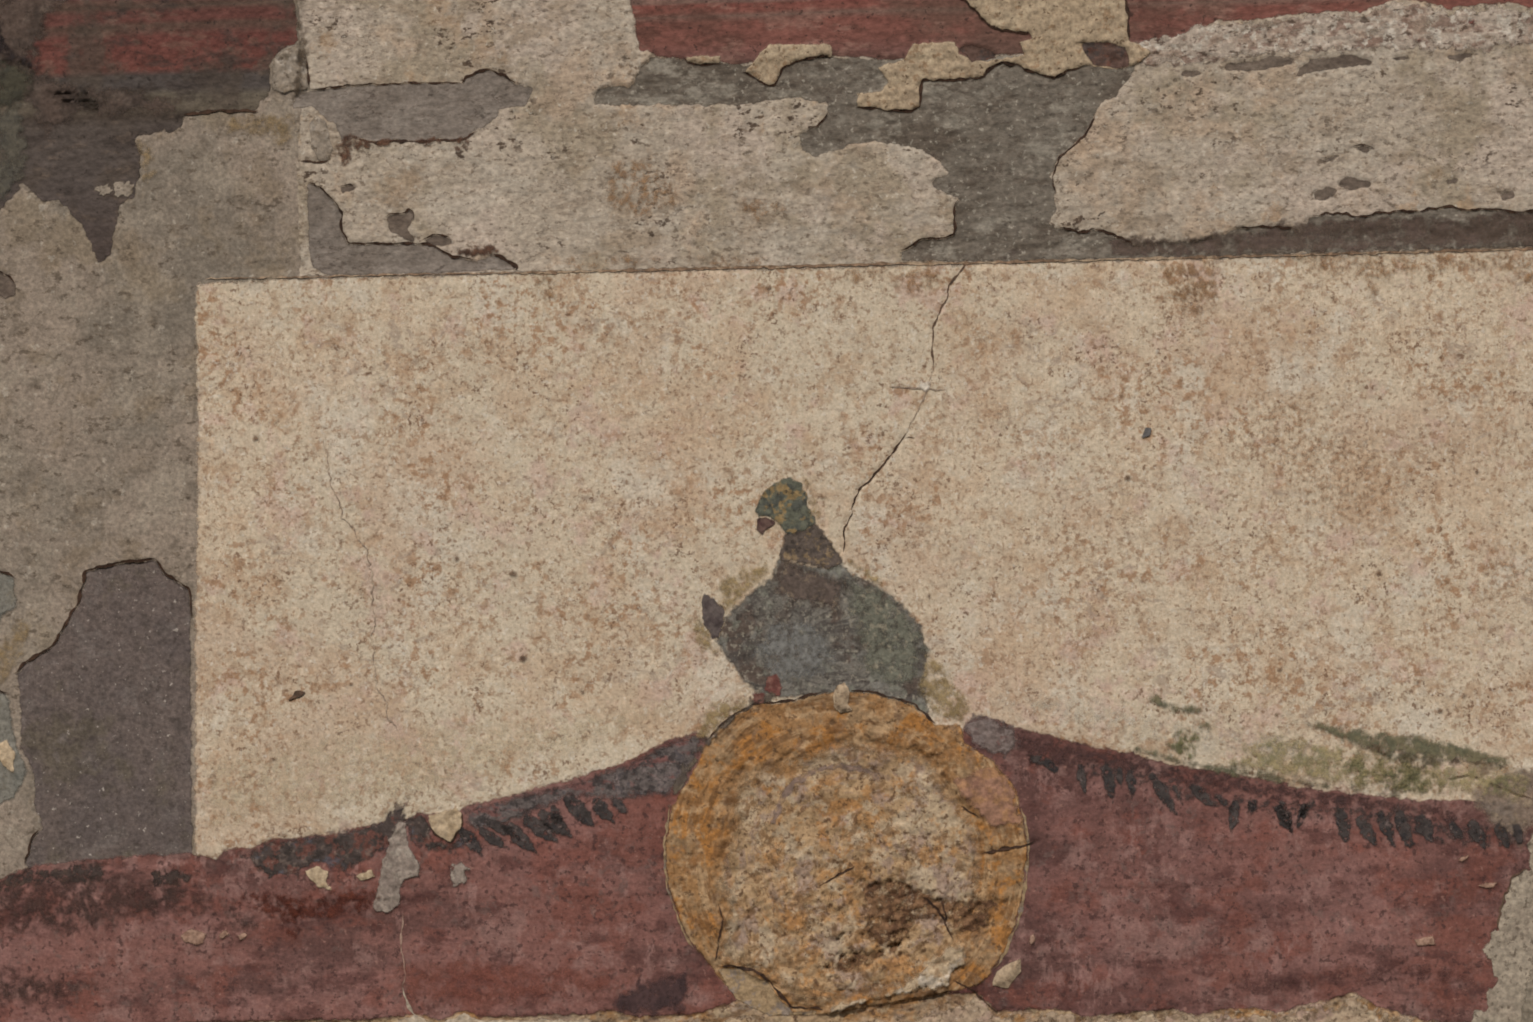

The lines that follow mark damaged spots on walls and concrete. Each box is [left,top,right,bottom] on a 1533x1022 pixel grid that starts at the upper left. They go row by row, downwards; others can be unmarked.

peeling [293,68,532,144]
peeling [594,1,1533,262]
peeling [307,182,518,275]
crack [207,247,1533,552]
peeling [0,558,193,892]
peeling [240,803,470,890]
peeling [1448,770,1533,835]
crack [1472,834,1533,1022]